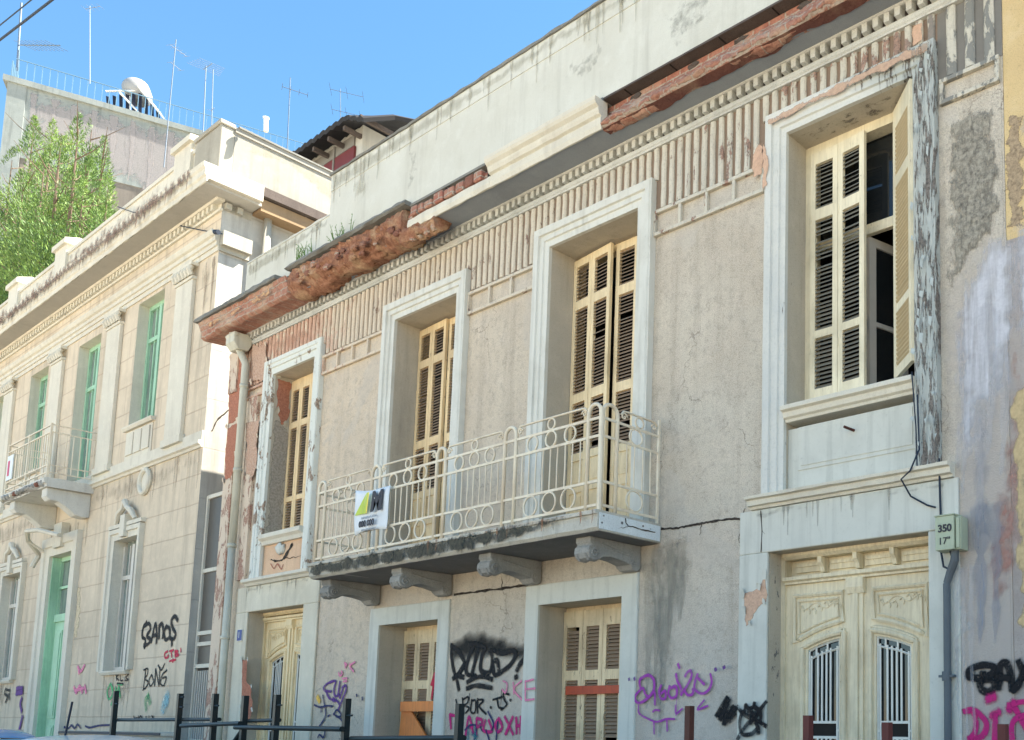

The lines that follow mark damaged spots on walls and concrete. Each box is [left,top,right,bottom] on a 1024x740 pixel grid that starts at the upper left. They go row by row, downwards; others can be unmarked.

peeling [910,46,933,210]
peeling [947,112,1024,283]
peeling [911,222,934,358]
peeling [222,341,295,531]
crack [621,509,765,552]